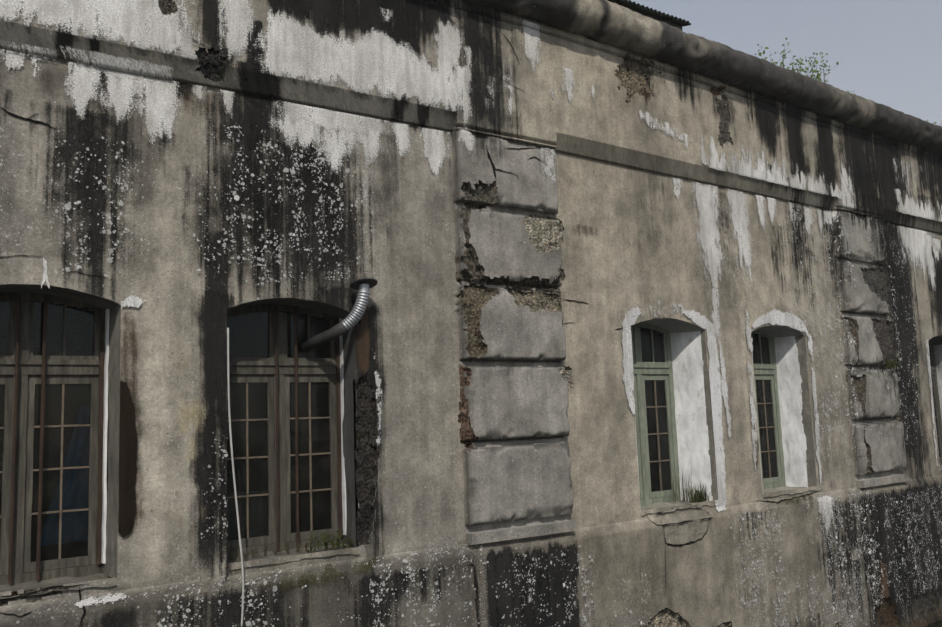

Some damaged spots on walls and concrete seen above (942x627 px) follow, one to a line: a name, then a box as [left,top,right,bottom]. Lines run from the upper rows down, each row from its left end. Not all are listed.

damp [518,19,541,72]
spalling [615,53,658,101]
crack [0,107,56,129]
spalling [710,85,733,146]
crack [0,255,106,289]
damp [0,0,522,627]
spalling [455,180,566,451]
damp [639,90,942,627]
crack [645,512,713,572]
crack [0,584,86,626]
damp [469,542,643,627]
spalling [643,609,690,627]